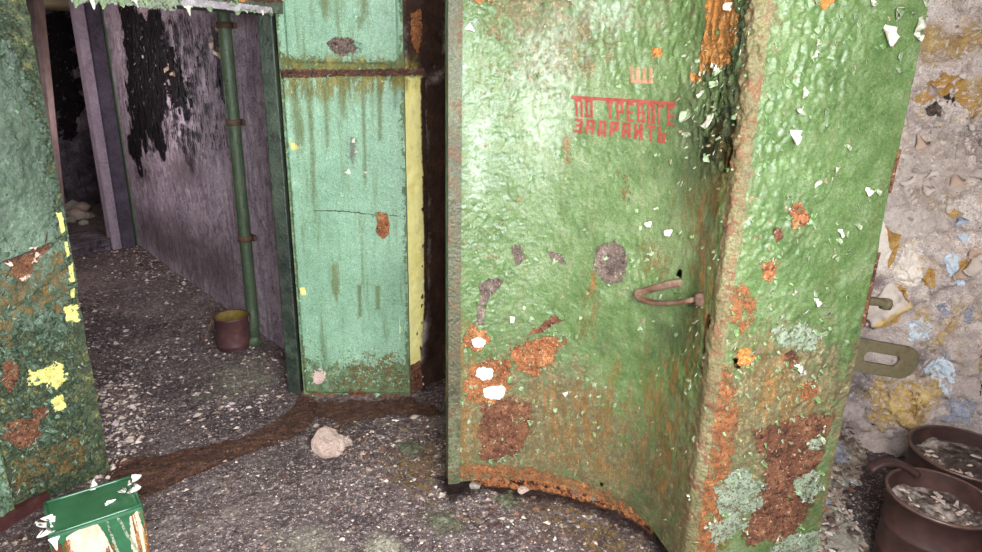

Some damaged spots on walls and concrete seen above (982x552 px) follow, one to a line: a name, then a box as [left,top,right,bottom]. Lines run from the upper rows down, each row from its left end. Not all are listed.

rust [690,0,741,83]
peeling [870,0,946,73]
rust [5,243,51,282]
spalling [853,81,982,427]
rust [304,352,443,427]
rust [460,278,653,552]
rust [692,283,835,552]